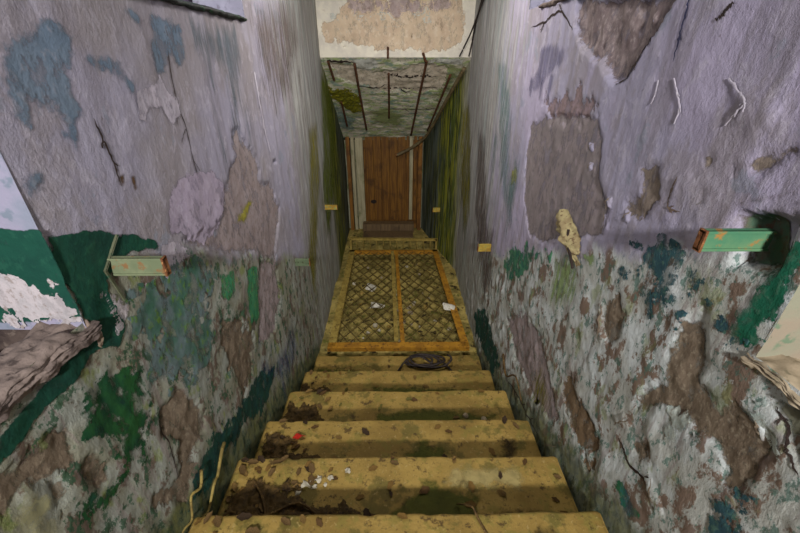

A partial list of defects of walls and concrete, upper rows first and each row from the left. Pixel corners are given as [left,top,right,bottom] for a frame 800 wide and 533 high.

crack [93,118,121,183]
crack [167,42,200,175]
peeling [321,0,466,136]
spalling [503,80,608,281]
spalling [577,0,676,82]
spalling [627,165,661,221]
peeling [0,130,280,530]
crack [618,438,649,488]
spalling [602,233,800,533]
crack [776,406,799,478]